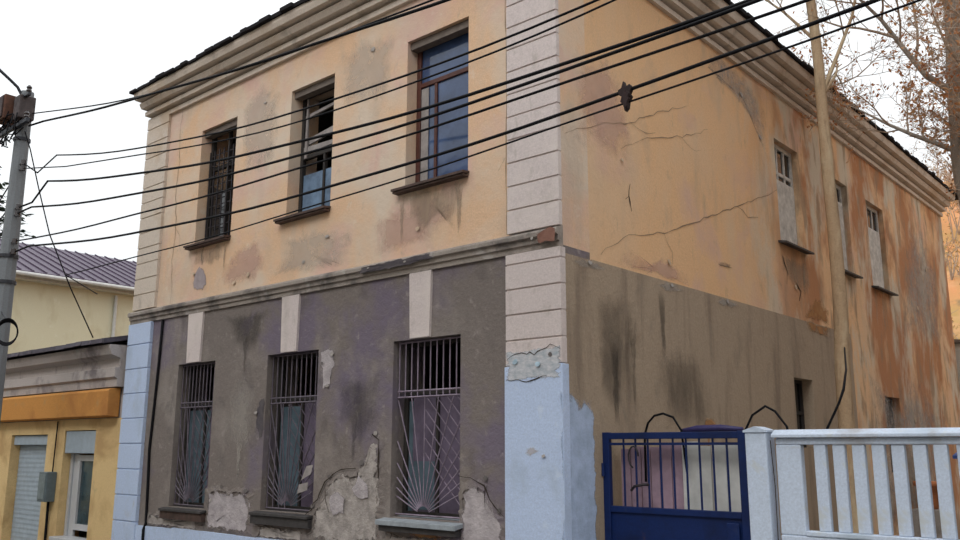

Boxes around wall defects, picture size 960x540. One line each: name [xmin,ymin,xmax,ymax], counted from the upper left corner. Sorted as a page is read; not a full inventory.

crack [566,106,708,151]
crack [602,190,776,263]
peeling [320,349,335,388]
peeling [506,344,561,382]
spalling [143,431,505,540]